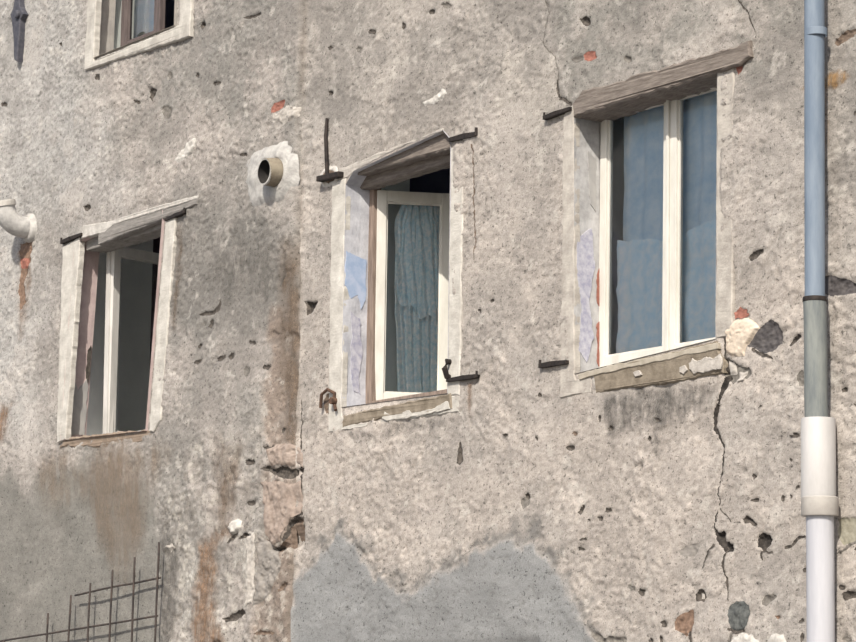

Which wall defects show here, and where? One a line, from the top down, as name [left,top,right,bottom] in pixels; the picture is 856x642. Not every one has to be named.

crack [738,0,757,38]
crack [543,0,572,105]
flaking render [747,319,802,359]
rust [220,463,235,514]
crack [702,372,741,601]
flaking render [222,428,305,622]
flaking render [838,517,856,552]
rust [194,532,224,642]
flaking render [591,632,627,642]
flaking render [649,589,707,642]
flaking render [727,601,750,634]
flaking render [839,585,856,601]